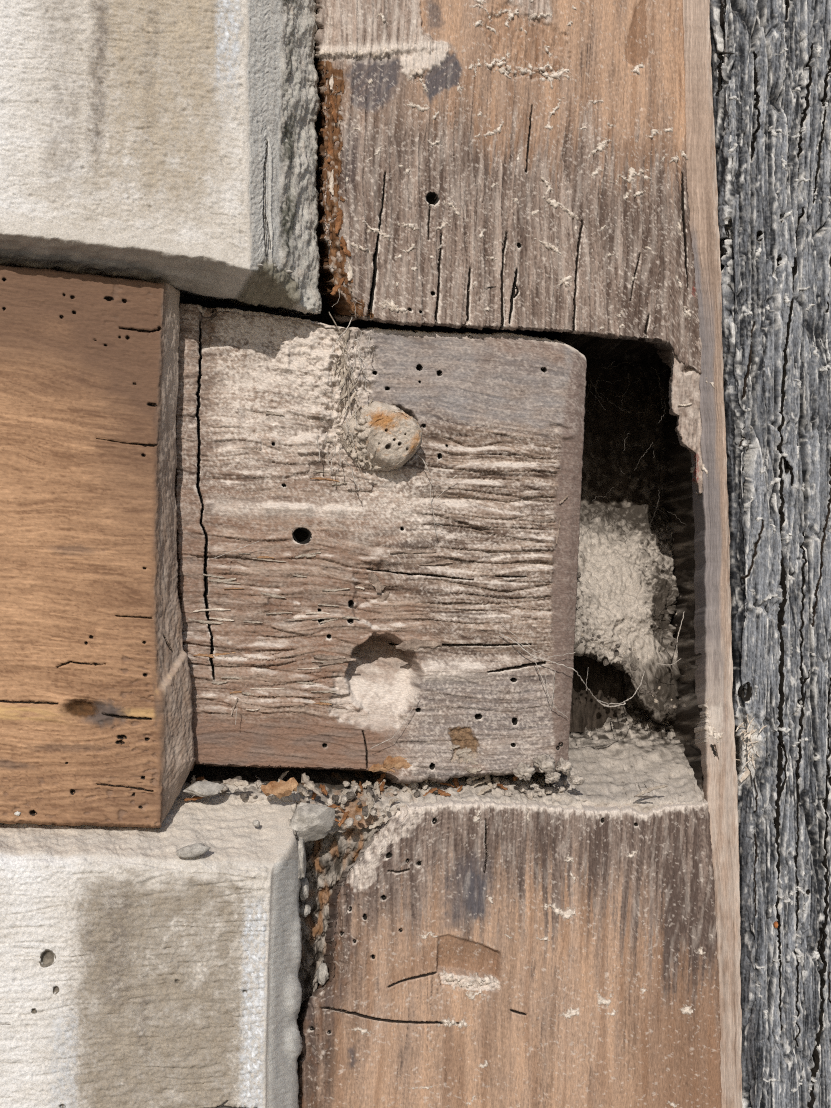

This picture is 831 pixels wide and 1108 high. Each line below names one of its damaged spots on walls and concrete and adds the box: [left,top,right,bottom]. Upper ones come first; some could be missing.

crack [196,325,214,677]
crack [0,698,58,706]
crack [388,972,437,988]
leakage [52,879,266,1108]
crack [320,1007,459,1024]